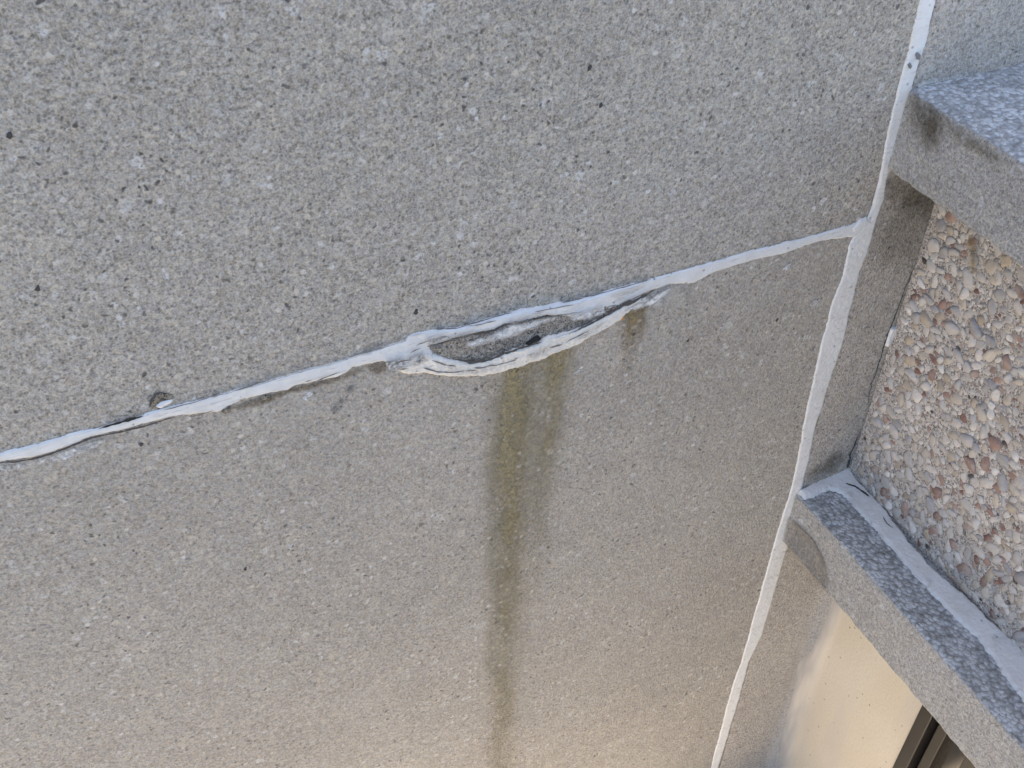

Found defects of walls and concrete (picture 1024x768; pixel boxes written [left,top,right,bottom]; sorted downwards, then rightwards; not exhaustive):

crack [437,312,512,330]
crack [562,279,650,303]
crack [0,347,384,463]
damp [545,349,567,448]
damp [497,367,527,630]